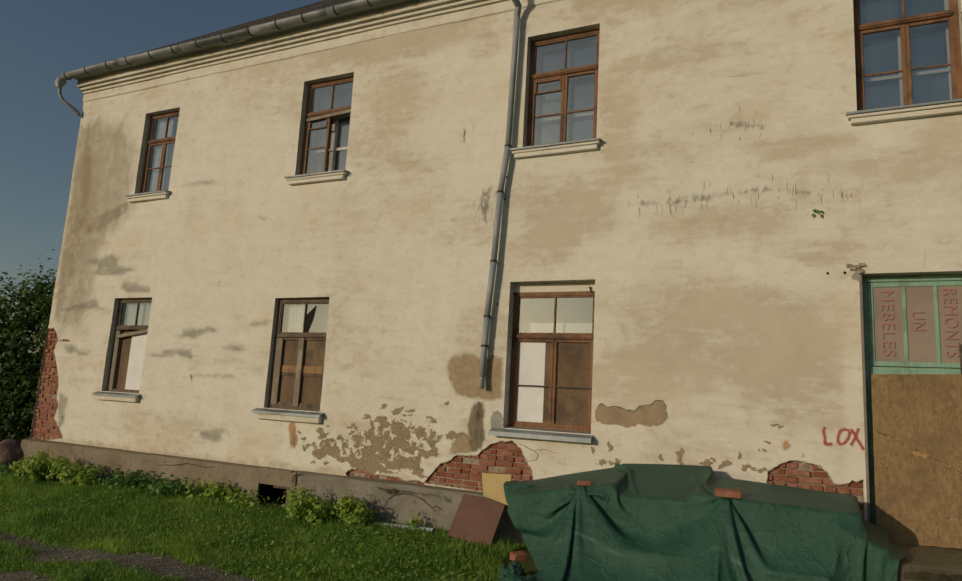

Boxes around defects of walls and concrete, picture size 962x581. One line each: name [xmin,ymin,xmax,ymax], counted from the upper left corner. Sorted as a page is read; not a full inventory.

flaking render [30,328,70,440]
flaking render [291,404,533,492]
flaking render [595,400,668,428]
flaking render [699,451,865,520]